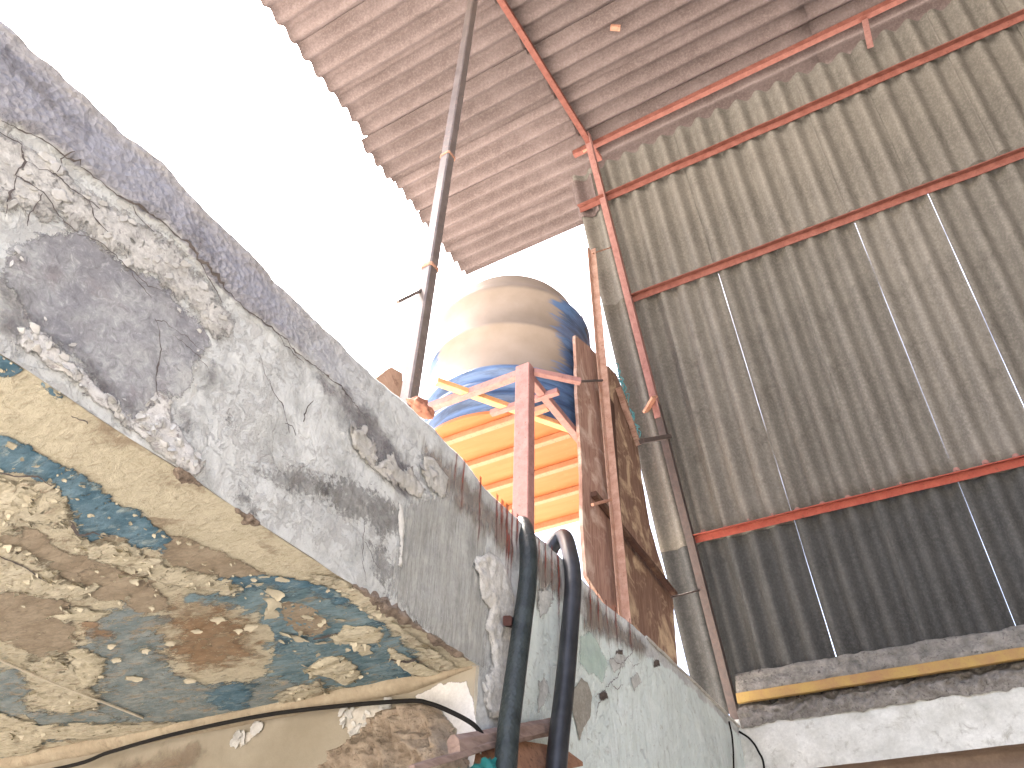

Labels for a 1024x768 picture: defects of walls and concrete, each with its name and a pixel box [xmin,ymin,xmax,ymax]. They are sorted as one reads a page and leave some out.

flaking render [0,121,235,487]
crack [0,121,368,420]
crack [261,359,314,435]
flaking render [0,420,487,757]
corrosion [496,495,519,564]
corrosion [538,533,560,600]
peeling [572,678,608,740]